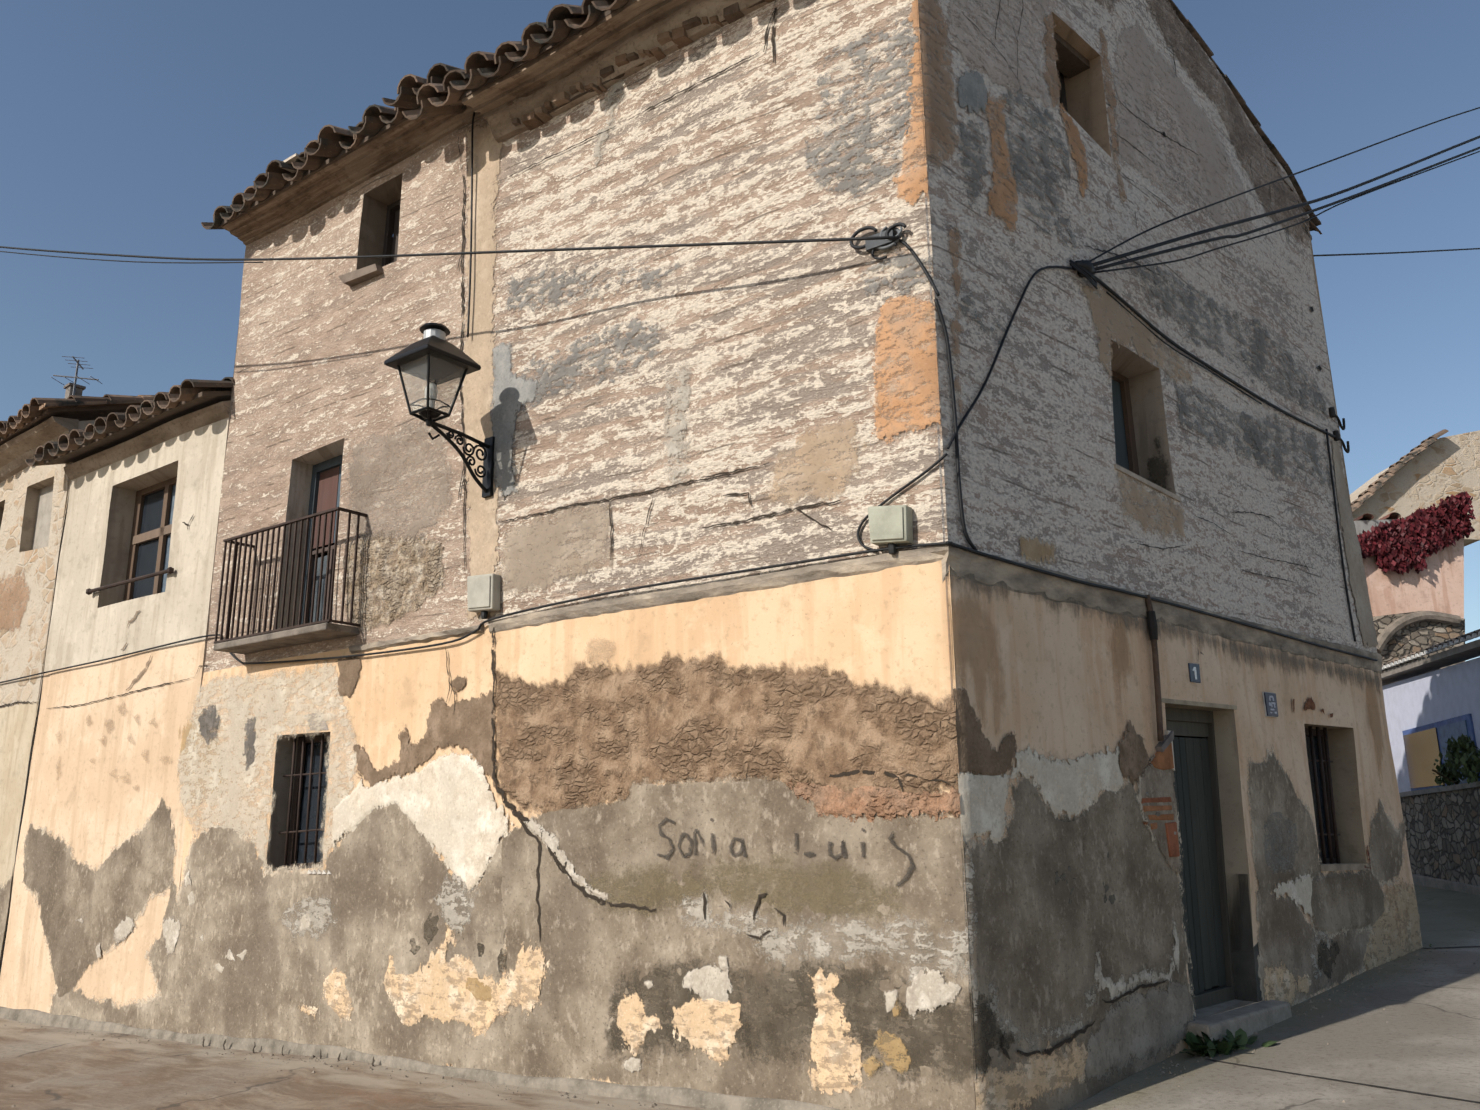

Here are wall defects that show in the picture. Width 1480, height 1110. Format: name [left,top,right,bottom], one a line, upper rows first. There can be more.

crack [445,648,455,715]
crack [491,627,656,938]
flaking render [0,730,1196,1110]
damp [953,687,1017,776]
flaking render [1247,745,1422,1007]